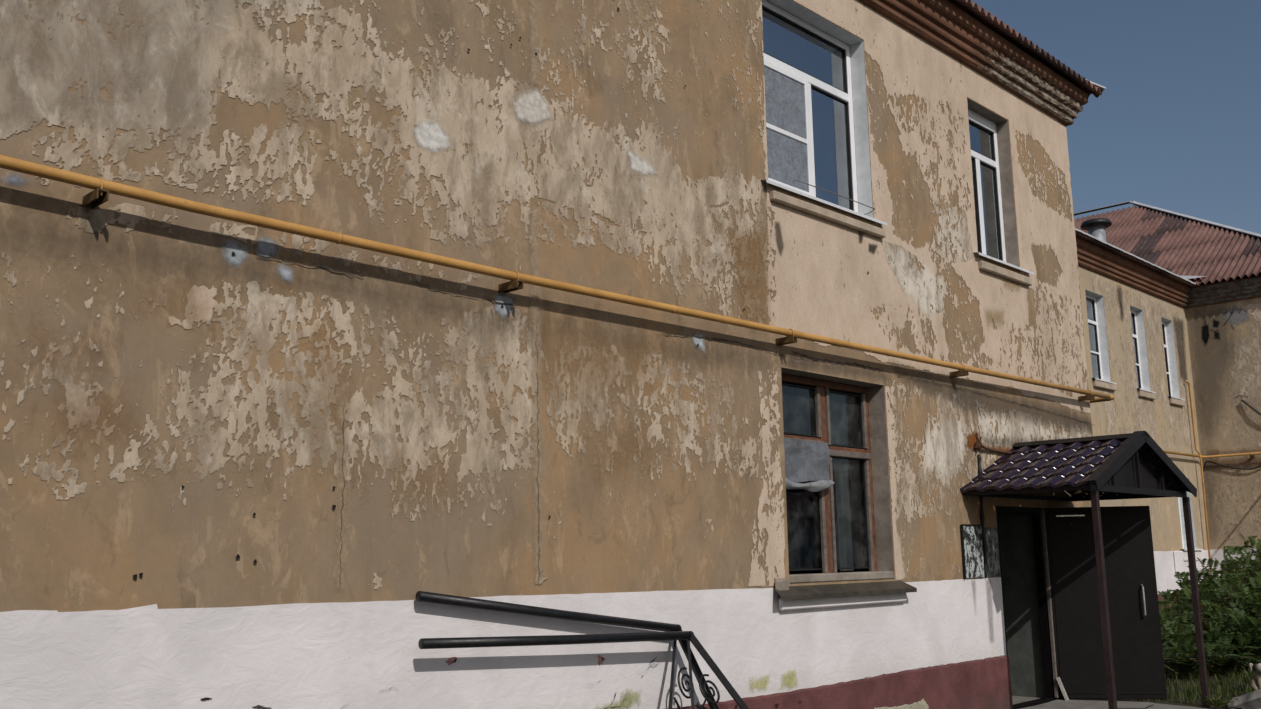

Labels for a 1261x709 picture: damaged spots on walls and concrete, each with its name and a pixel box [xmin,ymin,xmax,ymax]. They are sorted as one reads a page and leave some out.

crack [415,281,515,306]
peeling [0,0,1191,587]
crack [664,333,1095,426]
spalling [875,698,929,709]